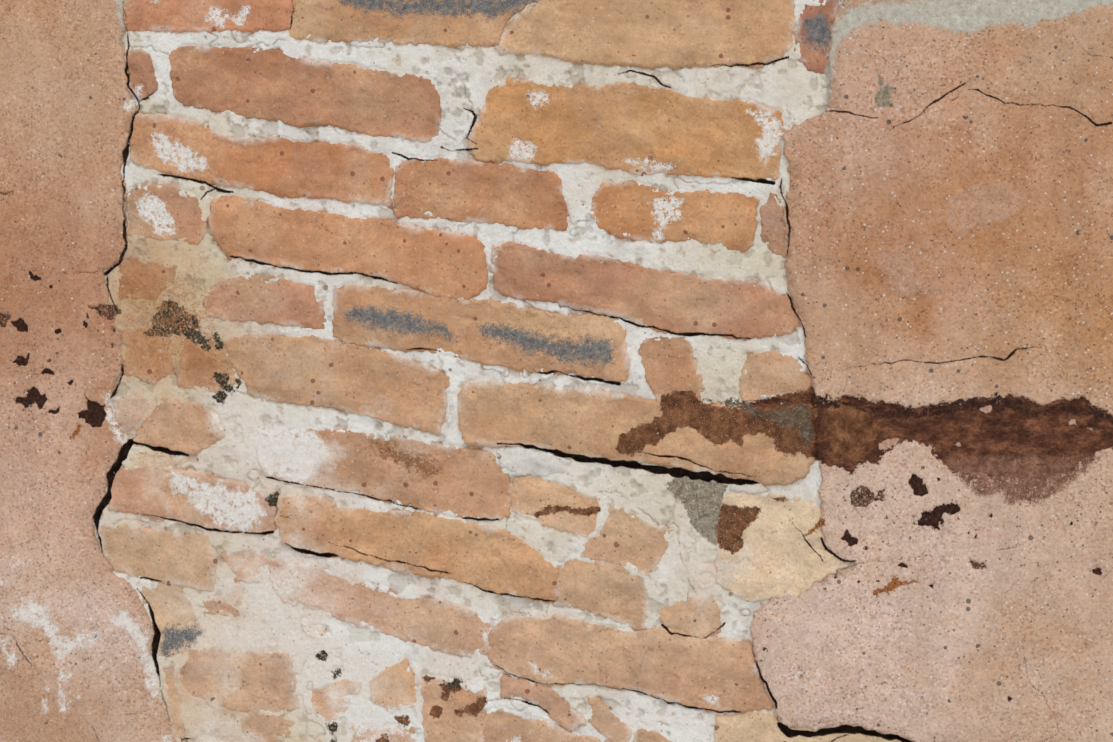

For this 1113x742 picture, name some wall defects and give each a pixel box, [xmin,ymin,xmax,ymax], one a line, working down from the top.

peeling [820,0,1113,115]
crack [826,83,1112,128]
leakage [143,298,224,352]
crack [847,346,1042,369]
leakage [212,372,242,406]
leakage [615,386,819,459]
spalling [365,437,443,480]
crack [92,439,189,552]
spalling [840,530,869,550]
crack [84,577,190,742]
crack [756,663,913,742]